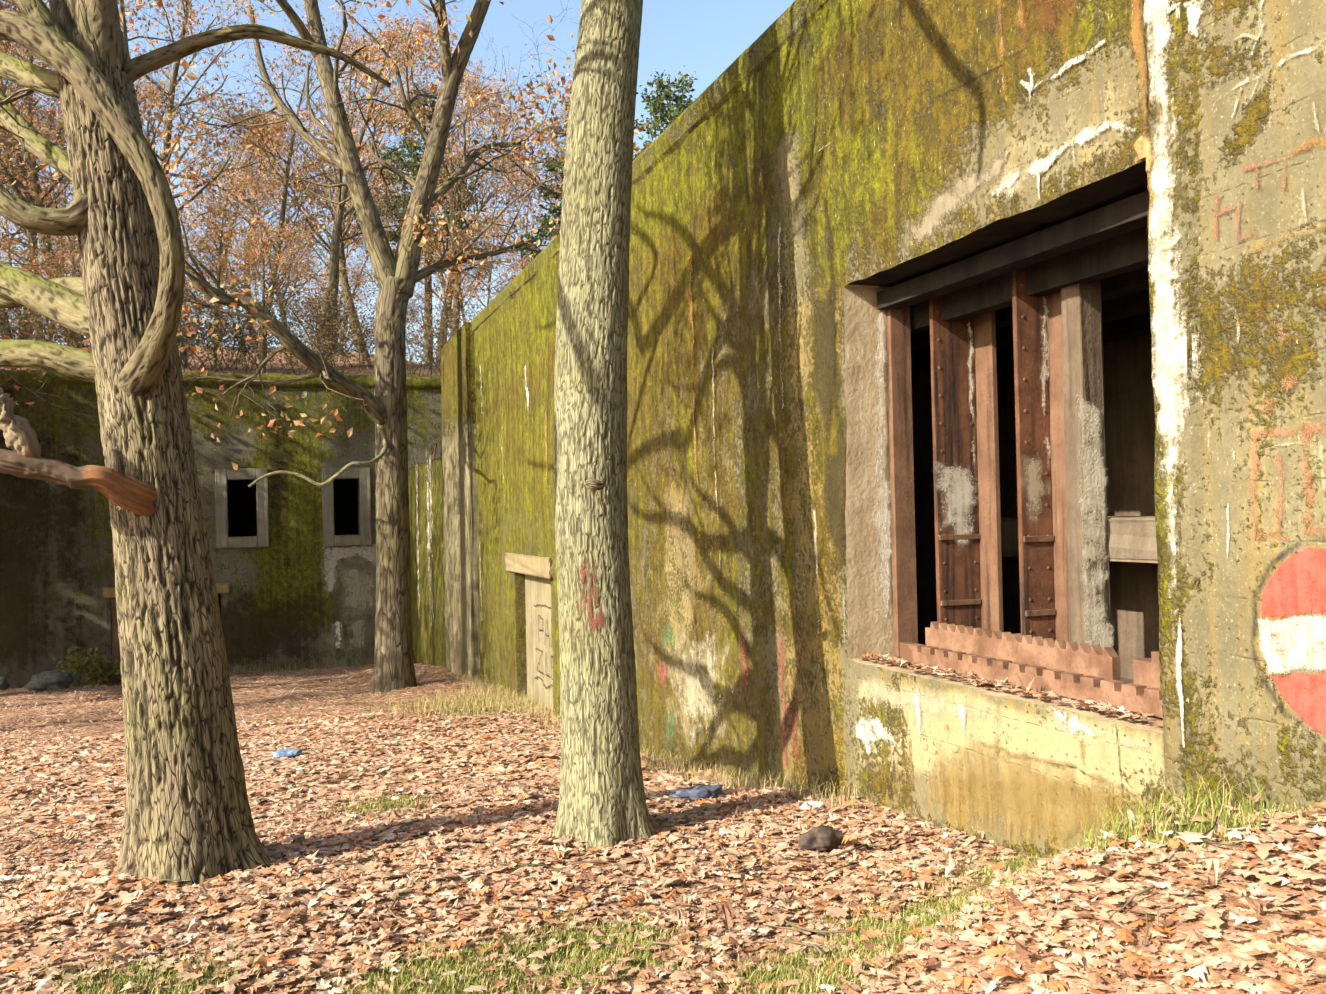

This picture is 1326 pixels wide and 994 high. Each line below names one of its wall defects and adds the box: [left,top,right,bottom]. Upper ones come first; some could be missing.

rust [1131,0,1147,114]
leakage [1144,0,1198,554]
peeling [856,683,979,755]
leakage [1175,612,1185,747]